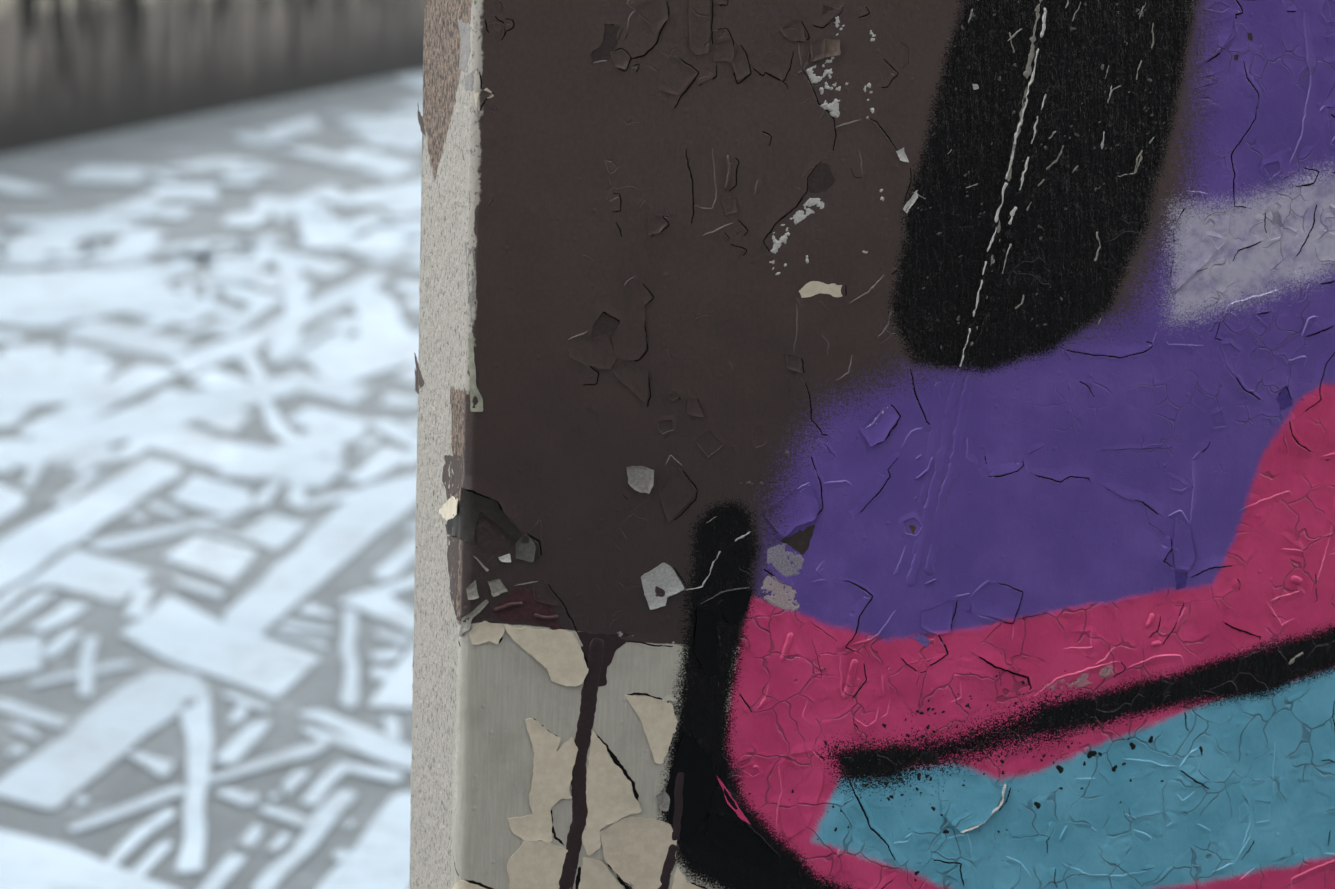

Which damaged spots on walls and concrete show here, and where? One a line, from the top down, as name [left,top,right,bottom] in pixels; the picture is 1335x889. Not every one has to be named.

peeling [648,4,932,275]
crack [1192,57,1262,216]
crack [740,367,1213,525]
crack [1055,320,1335,463]
peeling [438,454,589,687]
peeling [453,692,833,889]
crack [617,631,680,651]
peeling [641,563,686,610]
peeling [694,470,822,677]
crack [686,516,972,889]
peeling [938,772,1011,833]
crack [1122,710,1213,791]